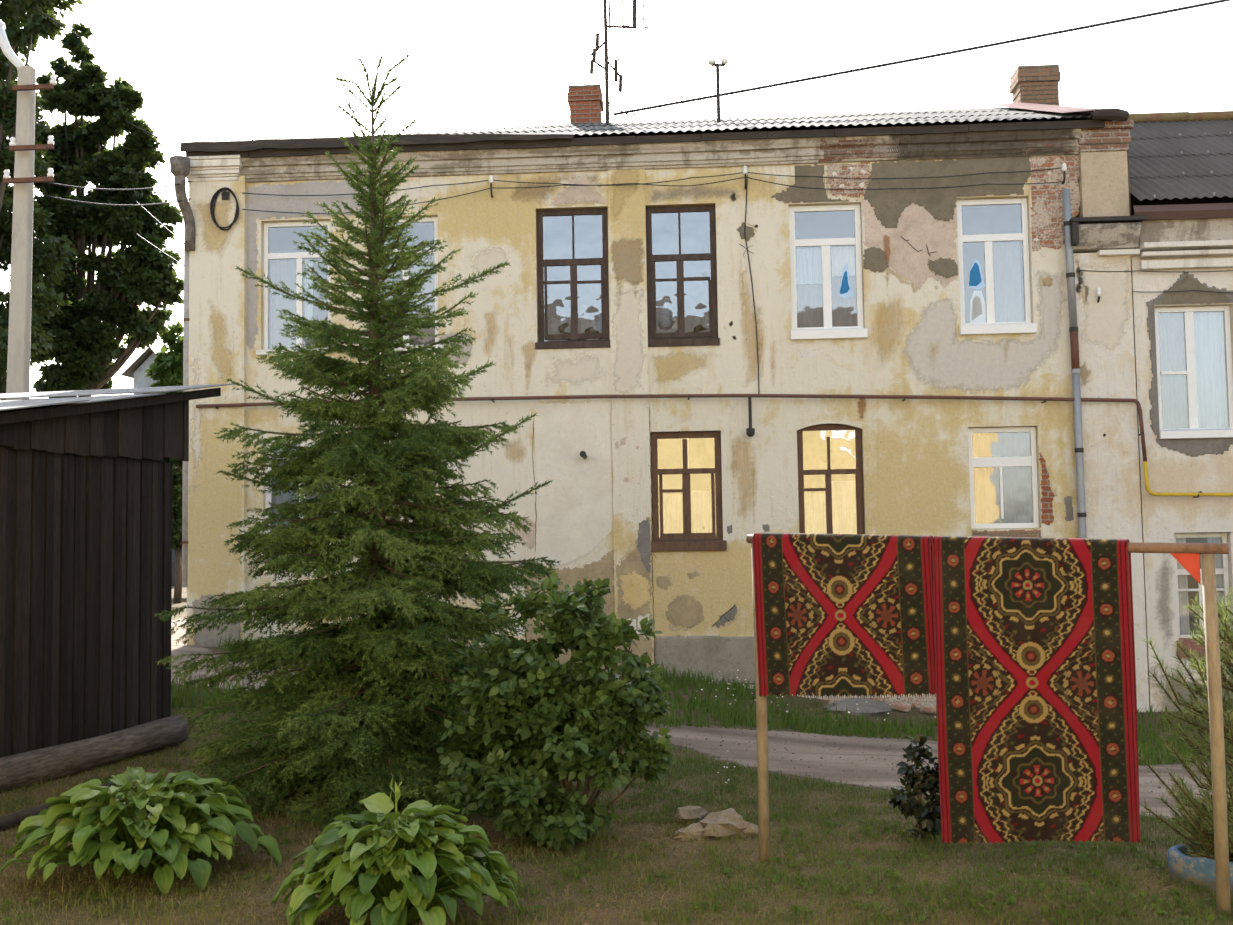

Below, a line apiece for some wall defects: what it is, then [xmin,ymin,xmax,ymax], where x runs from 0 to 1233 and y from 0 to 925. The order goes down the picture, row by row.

peeling [818,137,959,292]
flaking render [1022,135,1080,257]
leakage [612,239,643,294]
flaking render [1039,275,1054,287]
flaking render [972,453,1058,538]
peeling [525,517,741,640]
peeling [526,610,582,669]
peeling [600,634,654,673]